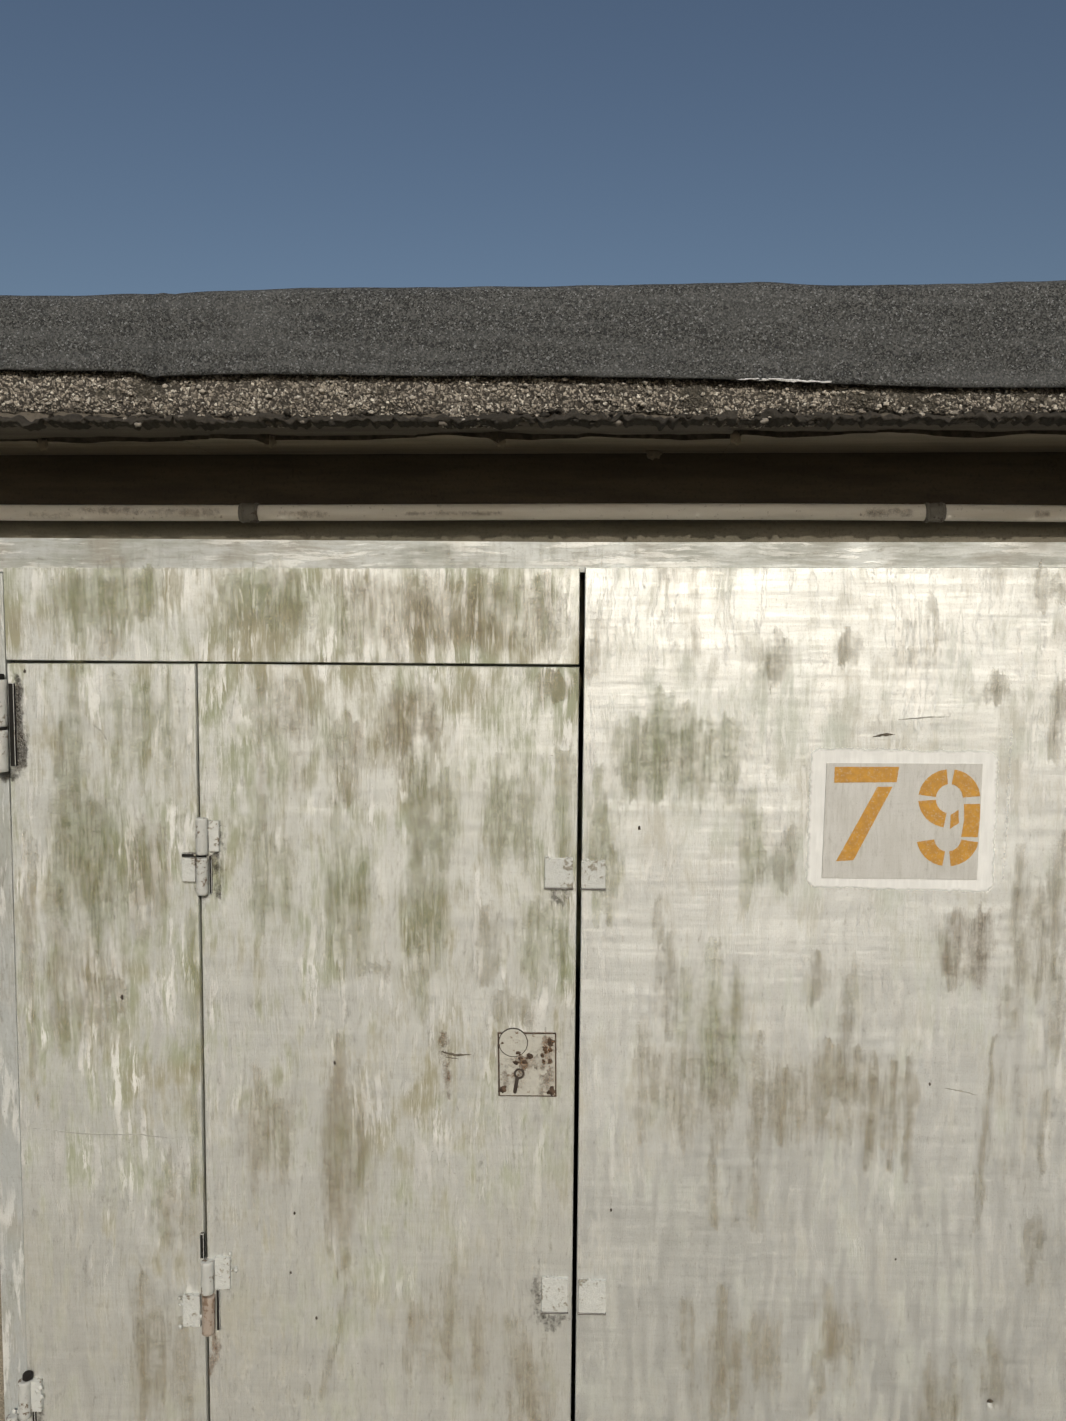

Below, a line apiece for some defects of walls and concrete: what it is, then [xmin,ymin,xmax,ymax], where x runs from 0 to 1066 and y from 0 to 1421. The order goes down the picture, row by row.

water stain [2,675,27,781]